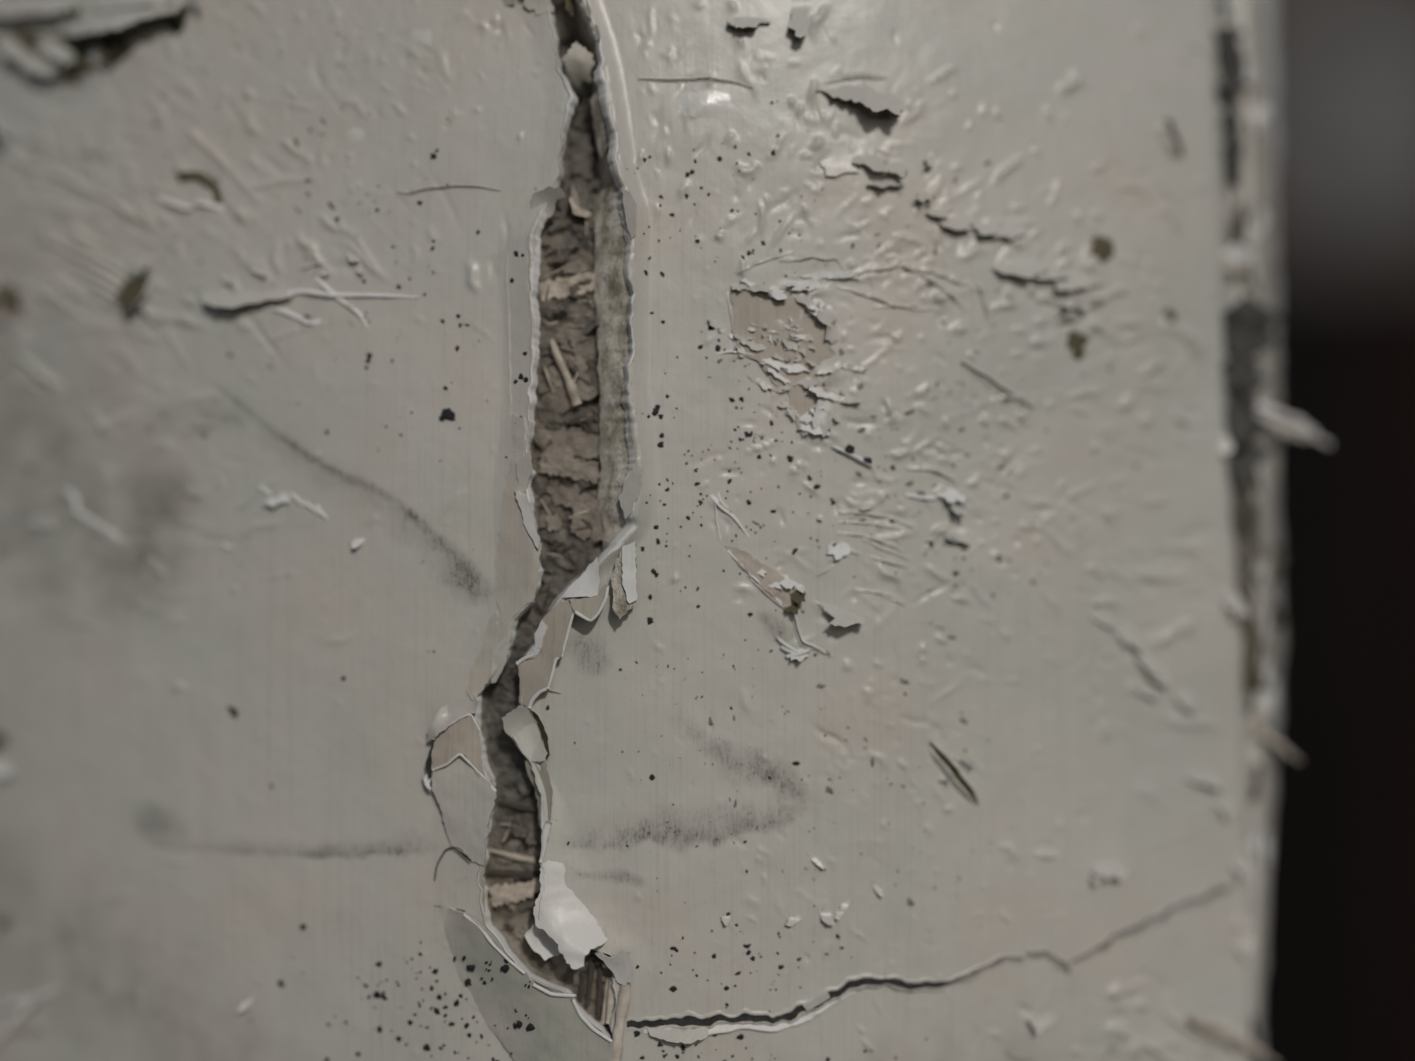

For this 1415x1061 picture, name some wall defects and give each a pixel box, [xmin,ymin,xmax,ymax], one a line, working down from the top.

peeling [0,0,201,86]
peeling [817,72,904,119]
peeling [820,147,1028,240]
peeling [708,249,1132,467]
crack [1214,0,1286,724]
crack [397,0,1272,1061]
peeling [827,541,851,560]
peeling [905,465,975,546]
spalling [725,545,865,662]